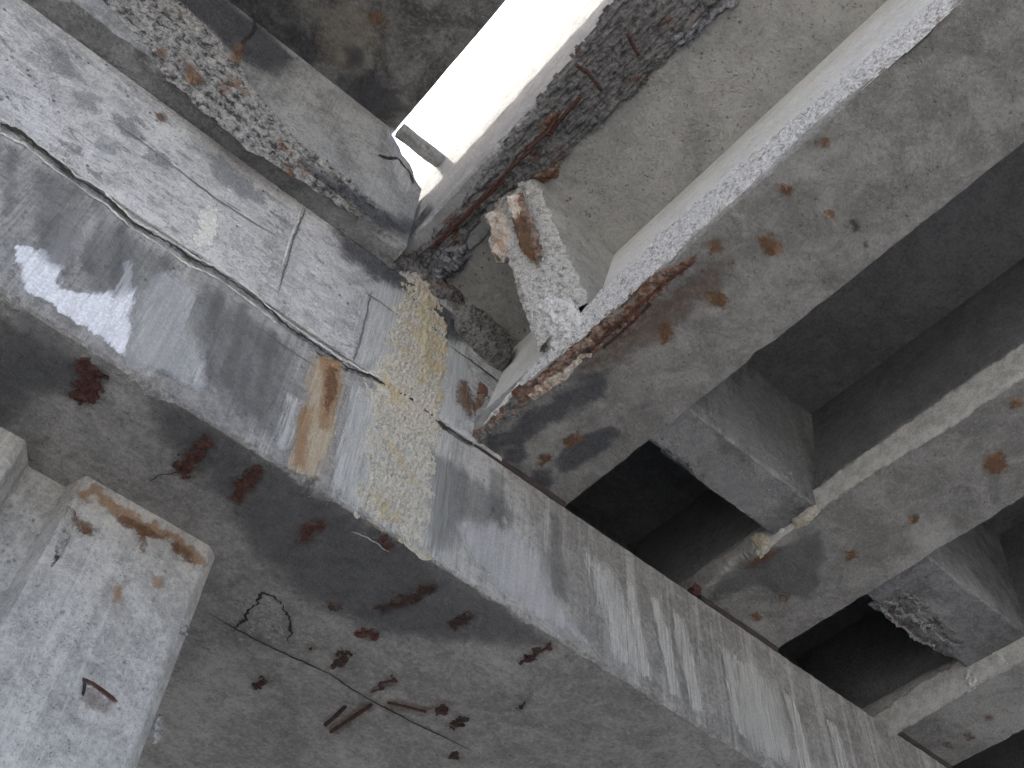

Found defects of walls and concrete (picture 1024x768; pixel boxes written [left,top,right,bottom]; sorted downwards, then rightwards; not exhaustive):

spalling [99,0,394,231]
water stain [15,225,205,389]
crack [0,119,473,445]
rust [507,192,543,265]
spalling [372,0,741,373]
spalling [472,0,958,444]
rust [80,485,204,564]
rust [289,357,341,475]
water stain [487,374,605,463]
water stain [533,426,620,487]
crack [208,612,474,752]
peeling [868,588,966,658]